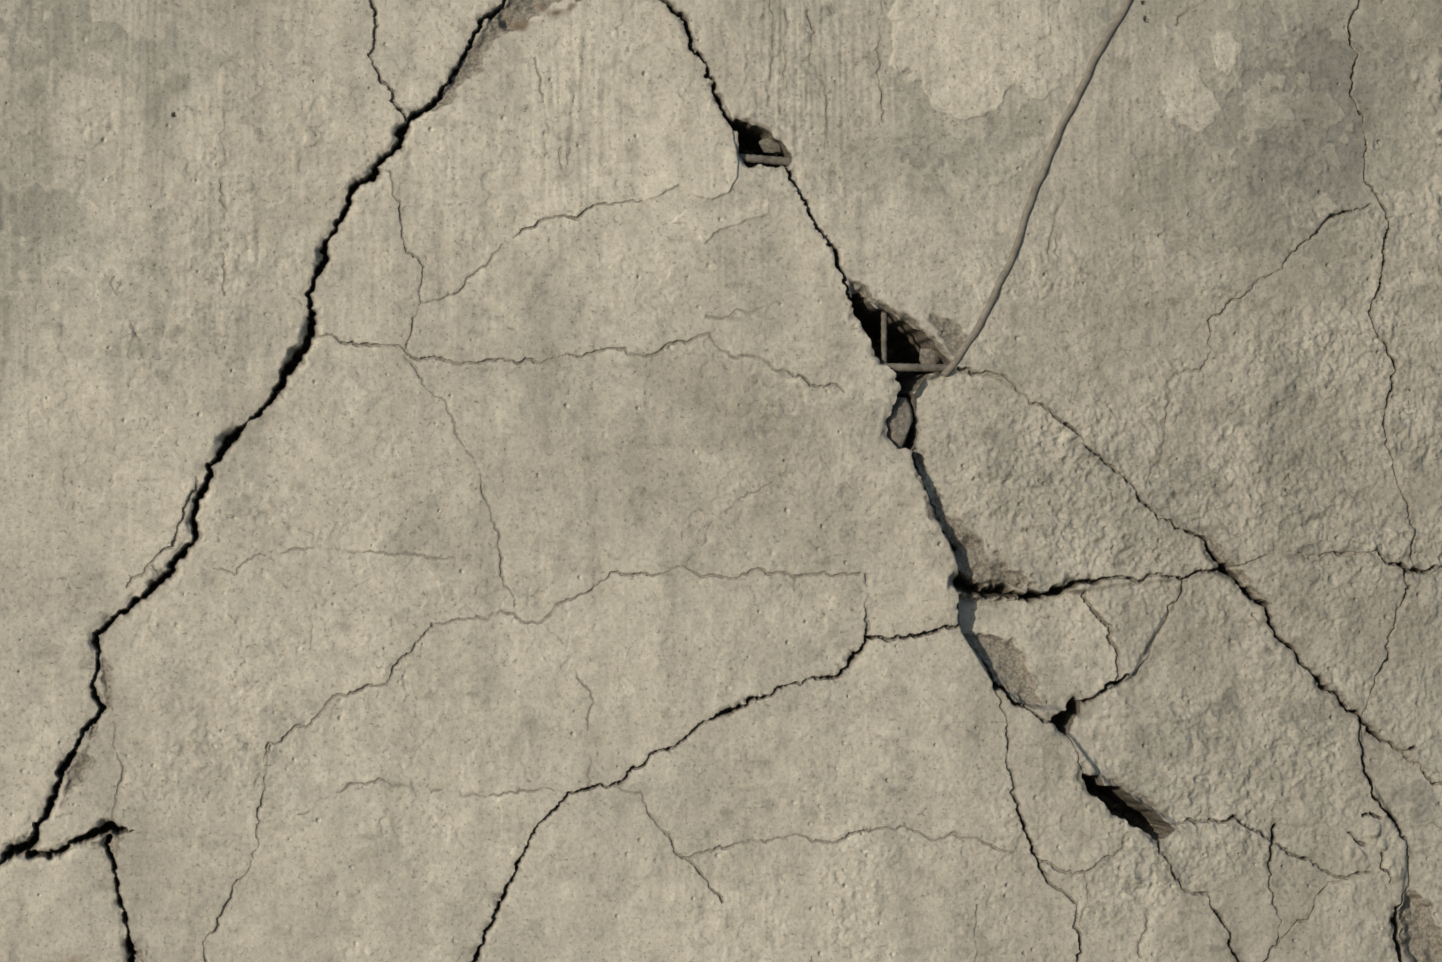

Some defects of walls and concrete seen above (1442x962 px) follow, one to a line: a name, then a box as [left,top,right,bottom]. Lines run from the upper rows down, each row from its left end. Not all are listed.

peeling [637,62,771,244]
spalling [846,276,970,368]
crack [0,0,868,962]
crack [471,0,1442,962]
spalling [965,630,1047,711]
spalling [1098,770,1175,824]